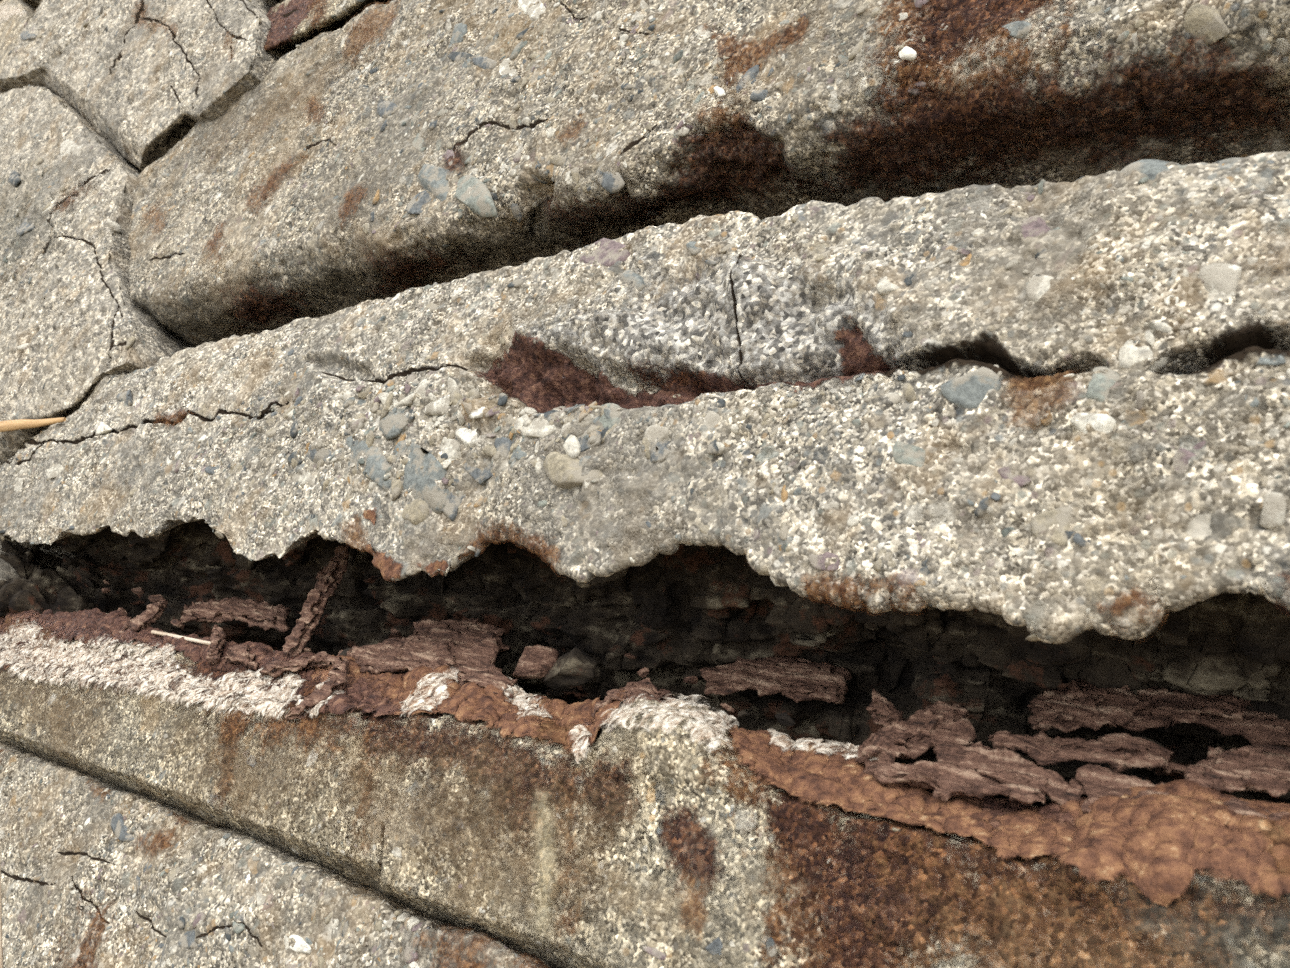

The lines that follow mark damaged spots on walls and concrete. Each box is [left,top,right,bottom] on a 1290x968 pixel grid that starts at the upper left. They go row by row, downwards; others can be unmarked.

crack [108,0,200,109]
rust [544,0,1290,246]
crack [30,169,127,368]
spalling [1071,229,1205,347]
crack [880,332,1083,390]
crack [1155,318,1290,375]
spalling [1065,530,1102,553]
rust [592,677,675,718]
rust [700,656,852,705]
spalling [894,749,937,765]
spalling [1221,791,1290,804]
rust [701,727,1290,968]